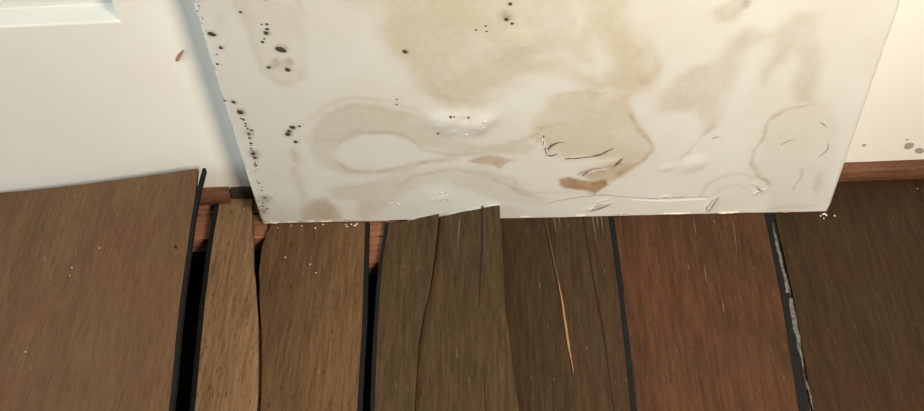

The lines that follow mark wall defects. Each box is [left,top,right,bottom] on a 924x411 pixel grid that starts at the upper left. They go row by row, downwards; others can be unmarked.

damp [223,100,269,213]
crack [477,206,485,303]
crack [543,142,708,410]